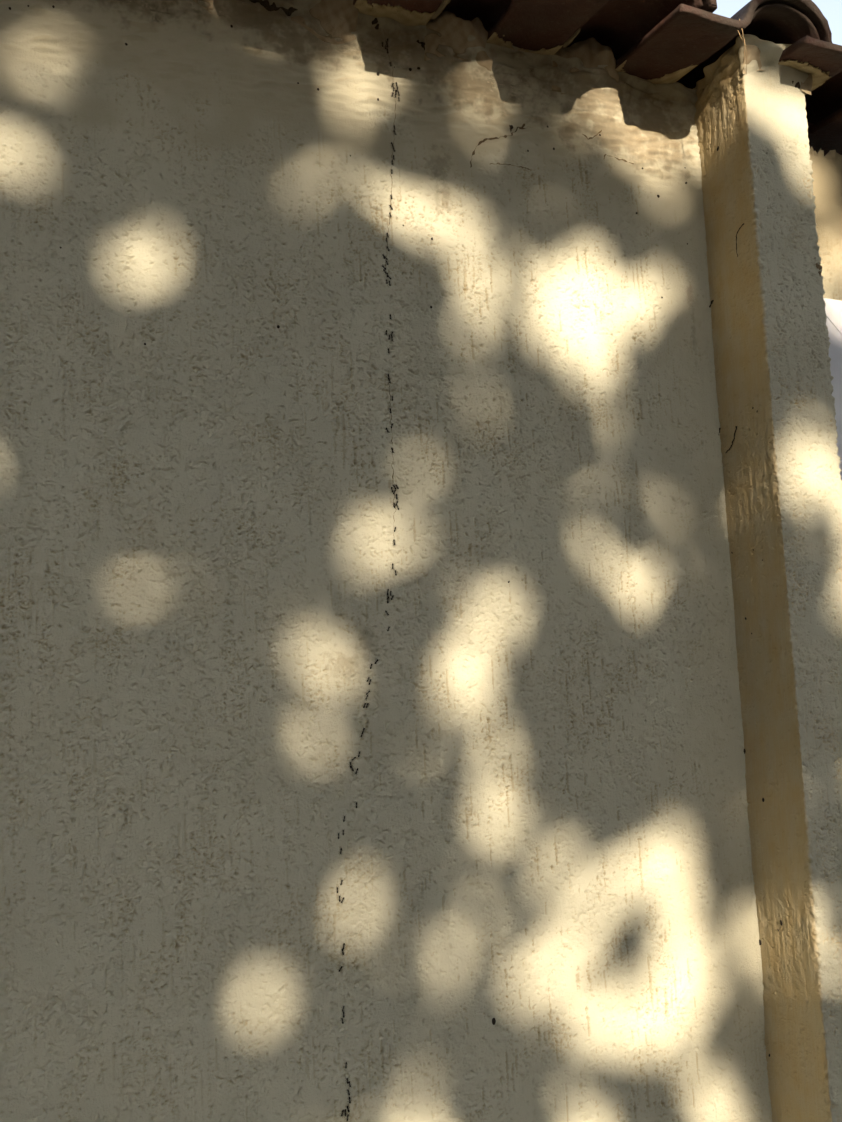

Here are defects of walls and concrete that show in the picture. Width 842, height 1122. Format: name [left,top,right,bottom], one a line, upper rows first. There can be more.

crack [470,124,530,170]